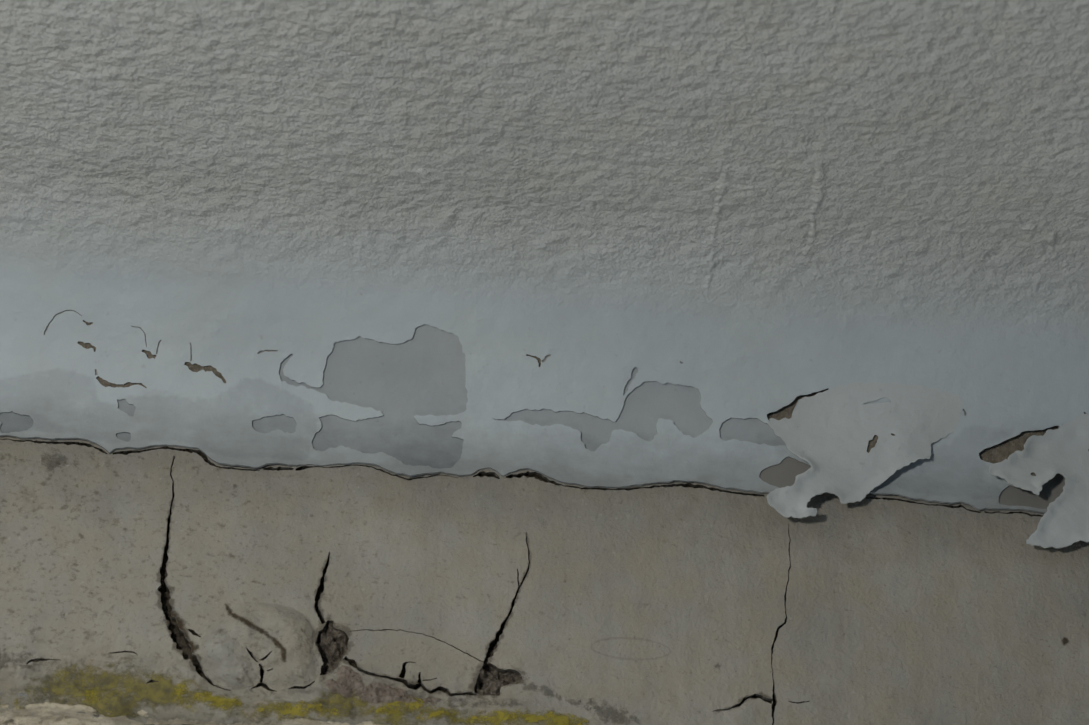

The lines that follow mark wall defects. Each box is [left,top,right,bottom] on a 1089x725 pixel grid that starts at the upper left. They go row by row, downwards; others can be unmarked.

peeling [279,324,468,469]
peeling [495,367,966,519]
peeling [979,414,1089,549]
crack [158,456,314,691]
crack [314,551,330,624]
crack [344,658,476,696]
crack [354,536,530,668]
crack [732,526,809,725]